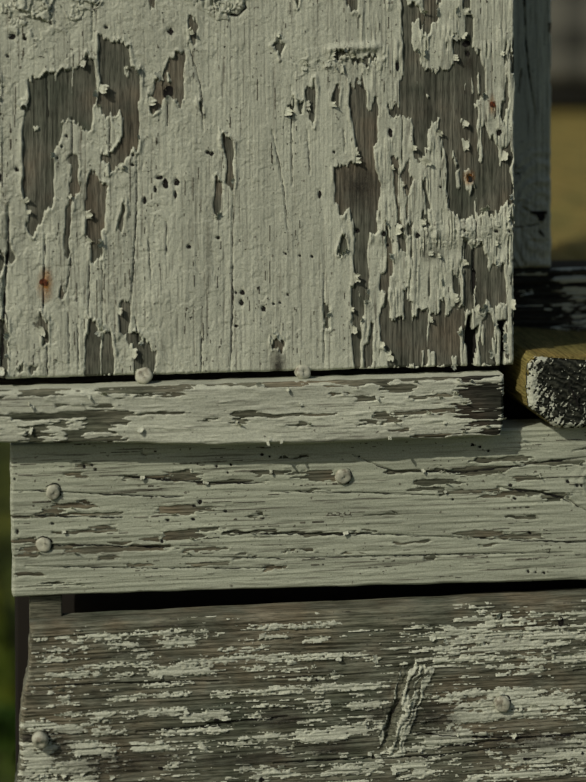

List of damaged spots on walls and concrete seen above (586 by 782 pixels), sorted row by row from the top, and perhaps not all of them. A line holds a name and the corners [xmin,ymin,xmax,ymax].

peeling [0,0,586,443]
crack [10,382,586,589]
peeling [384,455,585,502]
peeling [158,504,214,516]
peeling [11,537,40,553]
peeling [51,529,229,555]
peeling [452,530,545,540]
peeling [17,600,586,782]